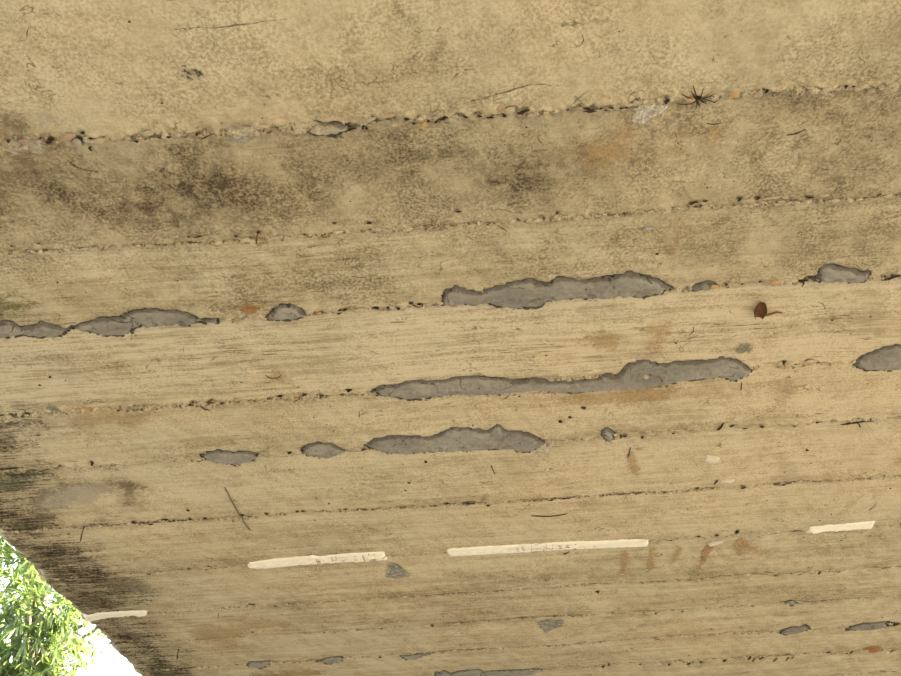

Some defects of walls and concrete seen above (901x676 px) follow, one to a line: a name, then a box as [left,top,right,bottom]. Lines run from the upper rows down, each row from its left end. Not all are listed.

leakage [0,299,36,316]
leakage [0,412,196,676]